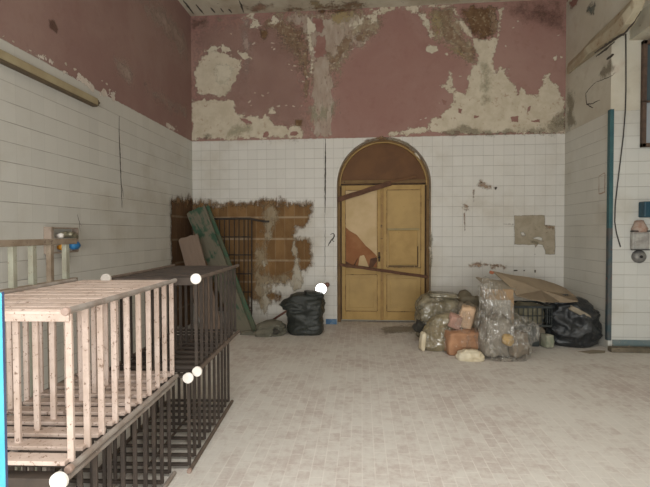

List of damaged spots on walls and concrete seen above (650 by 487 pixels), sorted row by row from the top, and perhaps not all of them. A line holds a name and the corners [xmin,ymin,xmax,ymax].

peeling [63,62,116,102]
damp [260,1,382,102]
peeling [192,4,565,143]
crack [117,133,125,199]
crack [321,139,329,207]
peeling [170,194,313,313]
peeling [514,215,555,255]
peeling [177,285,194,328]